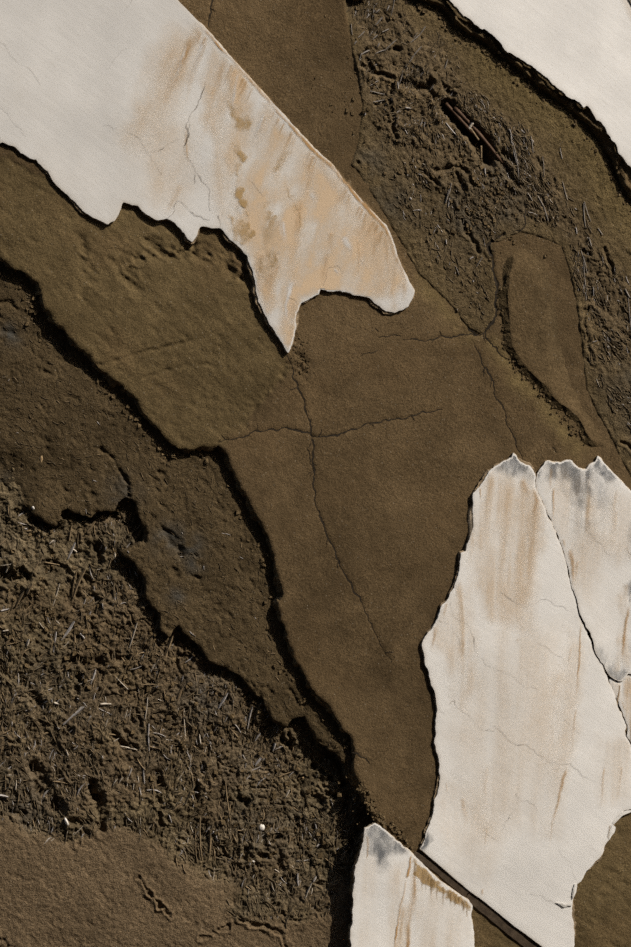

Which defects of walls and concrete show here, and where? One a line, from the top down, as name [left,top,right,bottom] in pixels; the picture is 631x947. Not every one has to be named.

spalling [0,0,631,477]
crack [364,202,527,458]
spalling [0,261,631,947]
crack [218,355,439,662]
mould [498,456,614,502]
crack [557,596,628,739]
leakage [413,860,470,909]